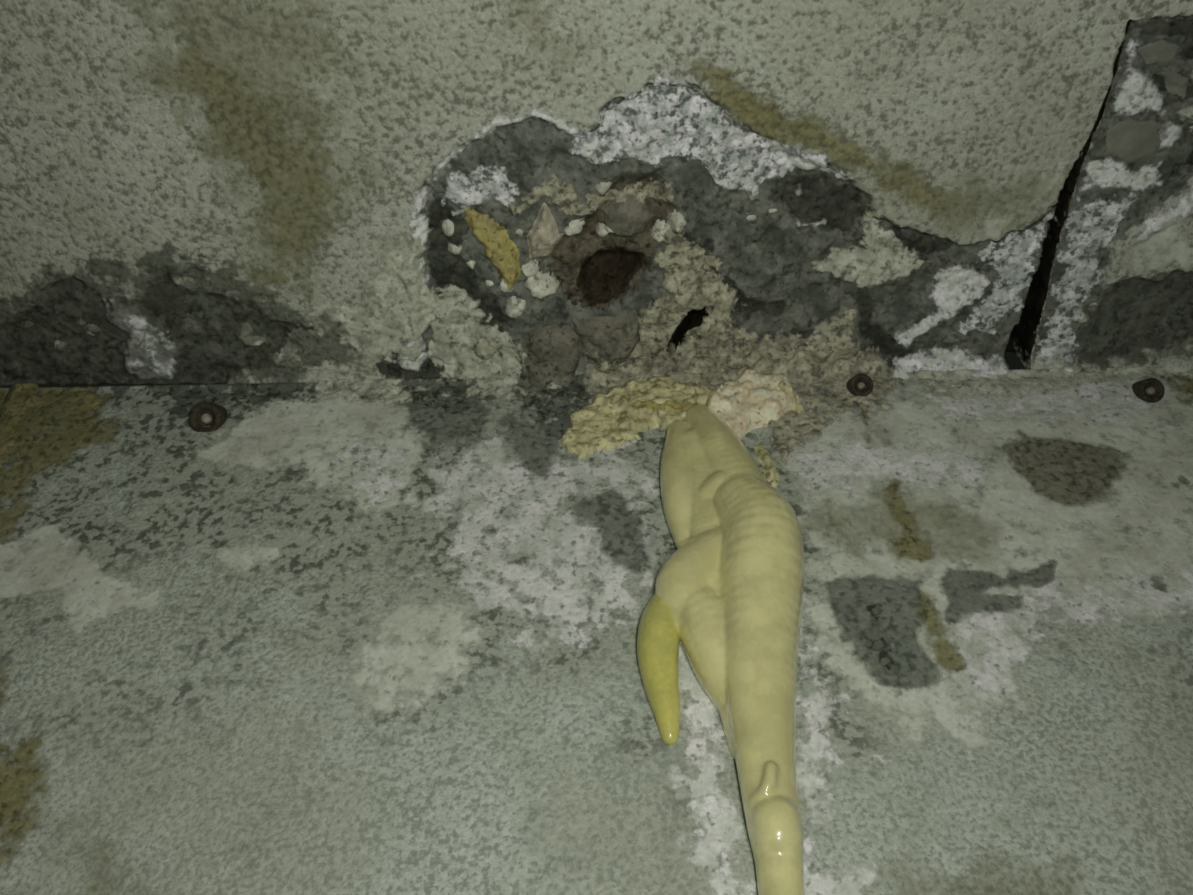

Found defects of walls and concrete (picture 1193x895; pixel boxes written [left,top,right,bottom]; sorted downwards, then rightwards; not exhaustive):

leakage [0,40,749,440]
spalling [376,15,1193,450]
crack [1003,19,1133,369]
spalling [0,265,314,386]
peeling [501,416,578,476]
peeling [1003,431,1125,506]
peeling [573,490,648,573]
peeling [828,575,939,690]
peeling [942,560,1056,623]